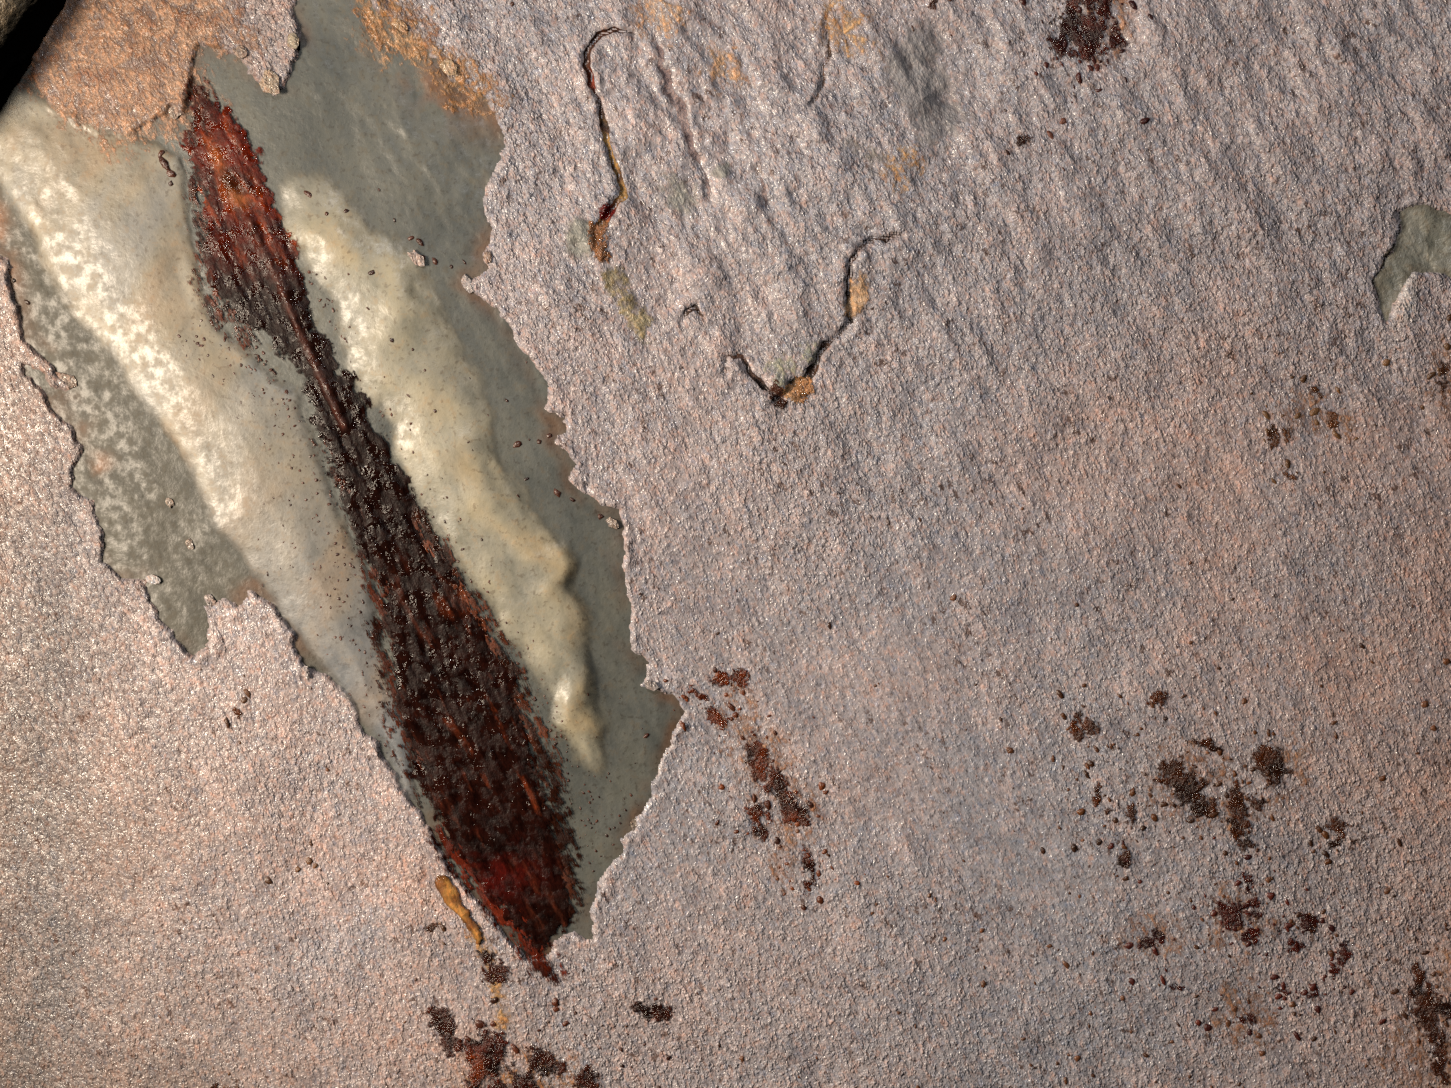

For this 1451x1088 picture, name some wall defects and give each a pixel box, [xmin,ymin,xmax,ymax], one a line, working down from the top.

peeling [0,55,46,113]
peeling [0,183,342,687]
rust [2,0,676,1088]
peeling [136,0,685,959]
crack [566,26,768,343]
crack [724,234,901,409]
crack [810,23,832,105]
rust [1004,0,1153,172]
peeling [1372,204,1451,322]
rust [673,663,839,911]
rust [1028,666,1364,1079]
rust [1351,882,1451,1088]